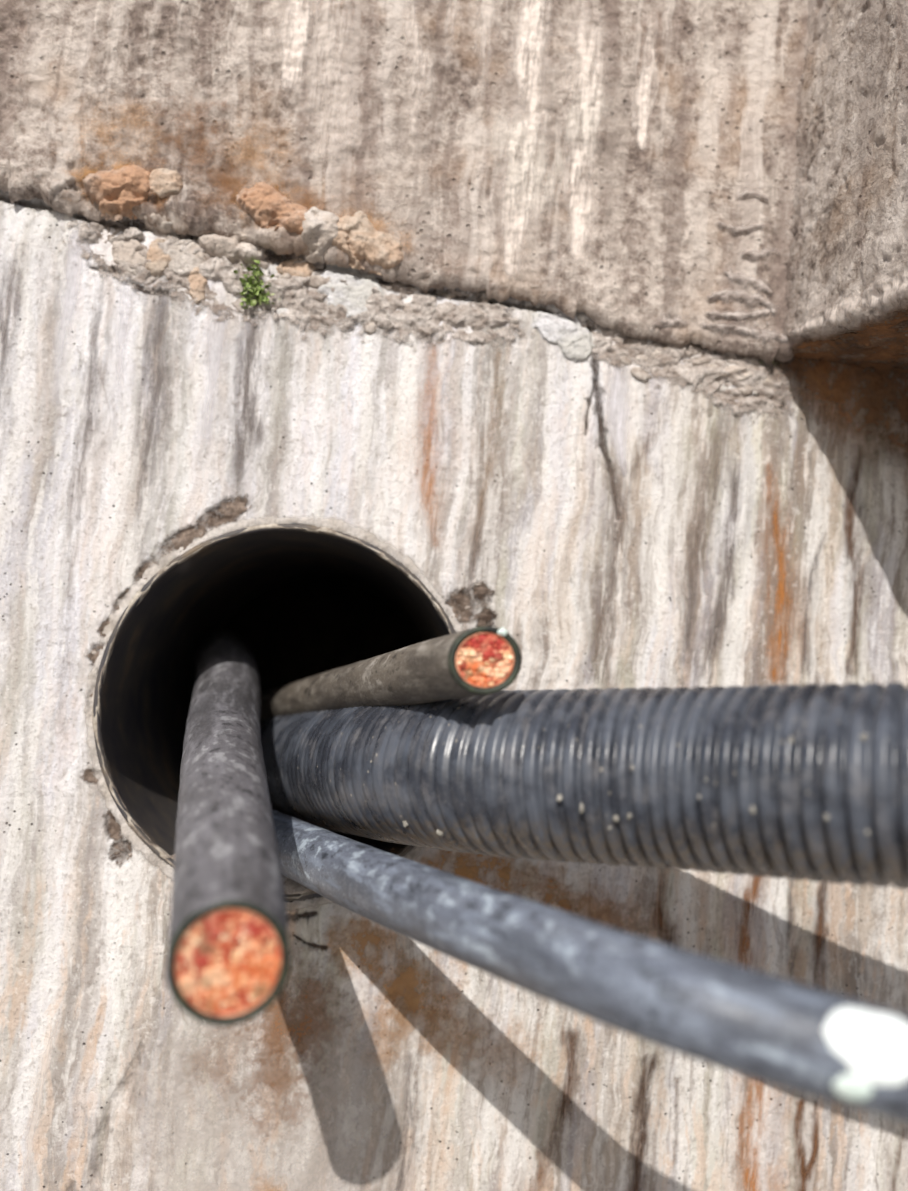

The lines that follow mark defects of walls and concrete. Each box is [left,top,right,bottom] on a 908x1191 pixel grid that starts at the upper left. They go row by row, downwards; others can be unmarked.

crack [0,197,147,230]
crack [266,252,326,275]
spalling [59,217,802,423]
crack [422,291,559,314]
crack [585,329,620,518]
spalling [87,494,252,665]
spalling [445,581,497,627]
rust [773,508,787,613]
spalling [81,769,98,783]
rust [329,920,445,1017]
rust [264,979,327,1055]